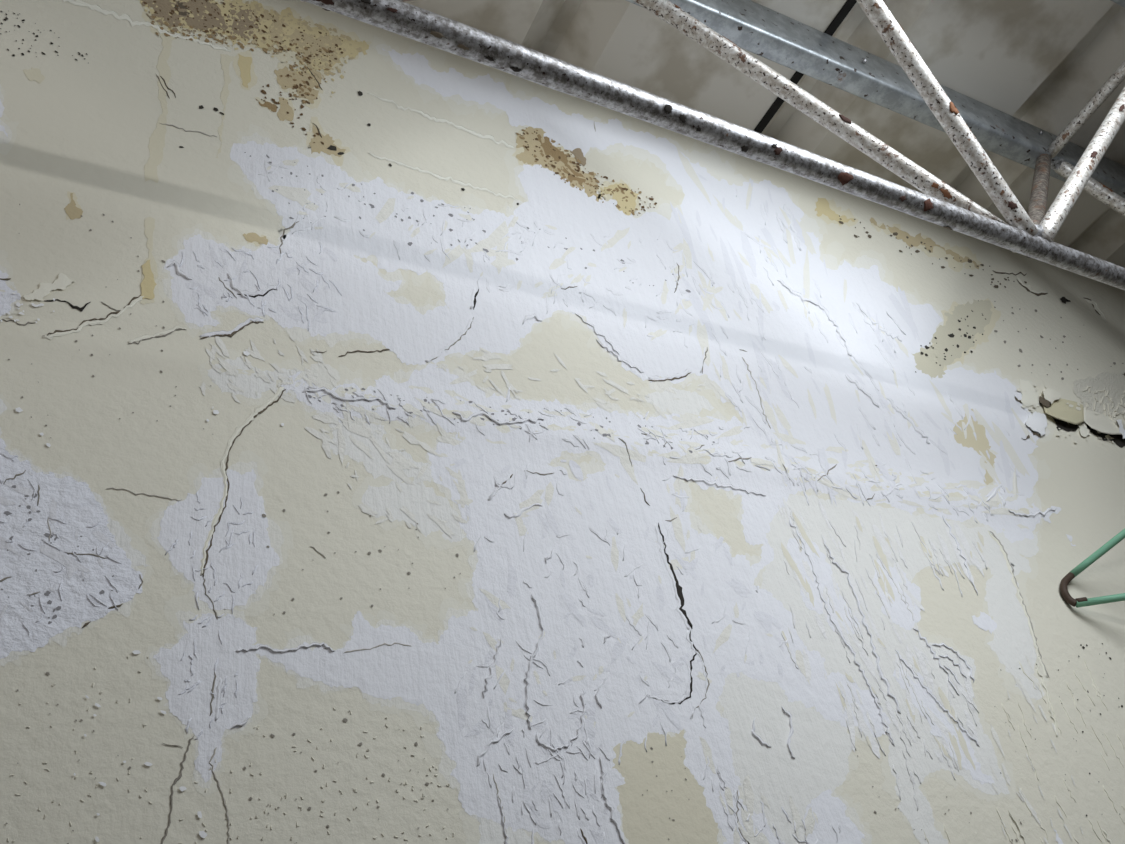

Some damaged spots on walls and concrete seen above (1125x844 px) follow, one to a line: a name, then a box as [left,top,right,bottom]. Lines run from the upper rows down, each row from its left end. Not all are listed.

rust [139,0,372,167]
rust [512,126,640,215]
crack [279,221,299,254]
crack [1,278,276,344]
crack [107,487,182,501]
crack [200,387,286,620]
crack [619,433,710,719]
crack [161,672,230,844]
flaking render [612,730,719,844]
crack [733,790,750,844]